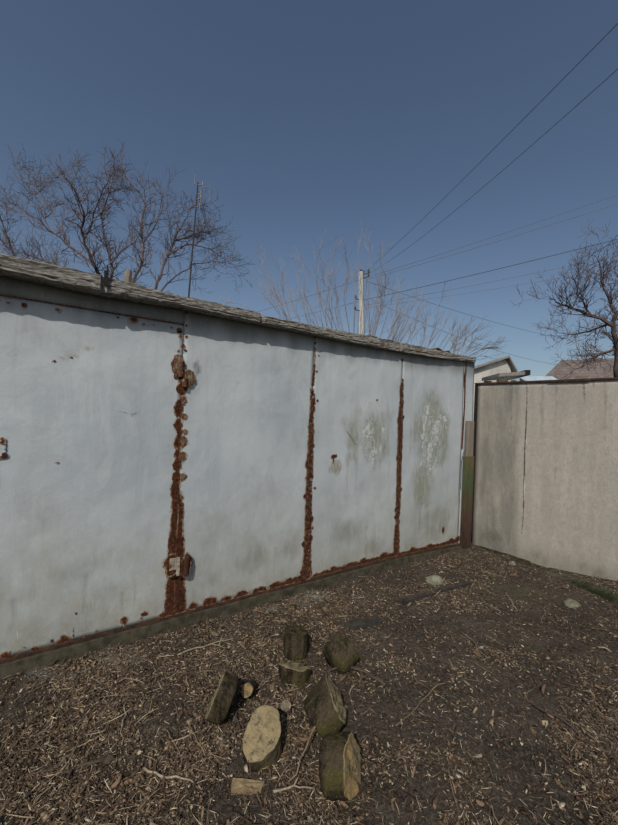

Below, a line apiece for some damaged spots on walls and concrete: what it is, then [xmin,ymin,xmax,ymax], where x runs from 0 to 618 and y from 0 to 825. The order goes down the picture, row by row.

rust [0,294,460,621]
rust [0,635,85,660]